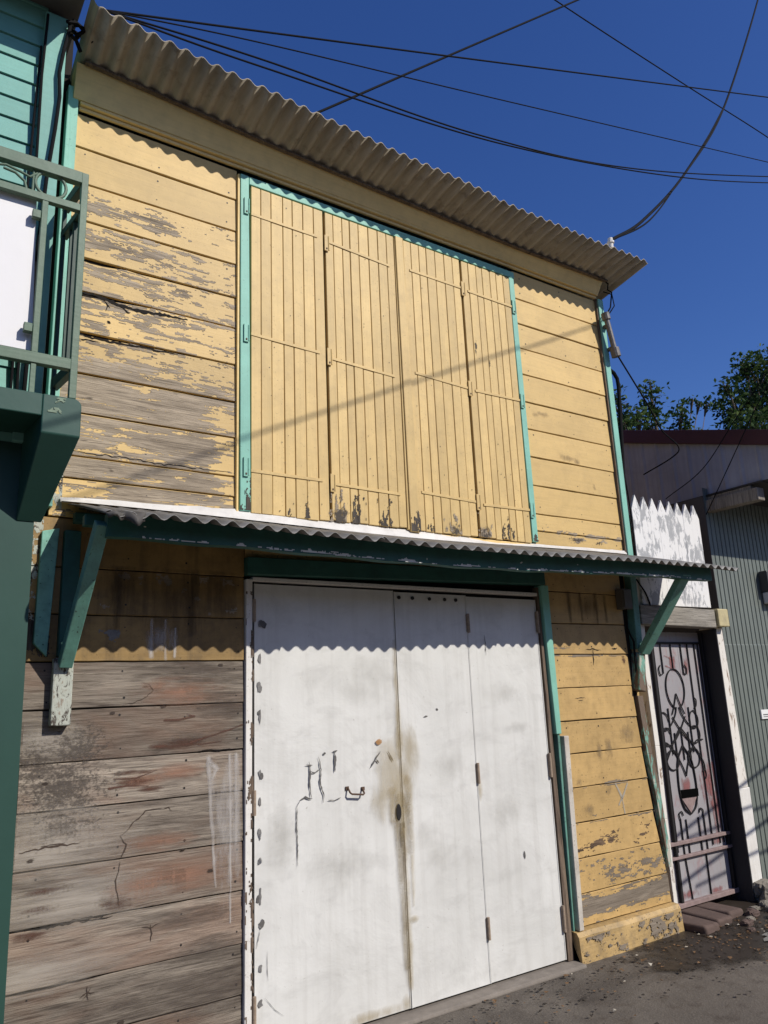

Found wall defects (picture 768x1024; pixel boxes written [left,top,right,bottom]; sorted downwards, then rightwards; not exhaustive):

crack [79,292,188,355]
peeling [28,190,251,621]
peeling [236,543,384,559]
peeling [508,562,705,580]
crack [19,807,172,931]
peeling [577,810,683,965]